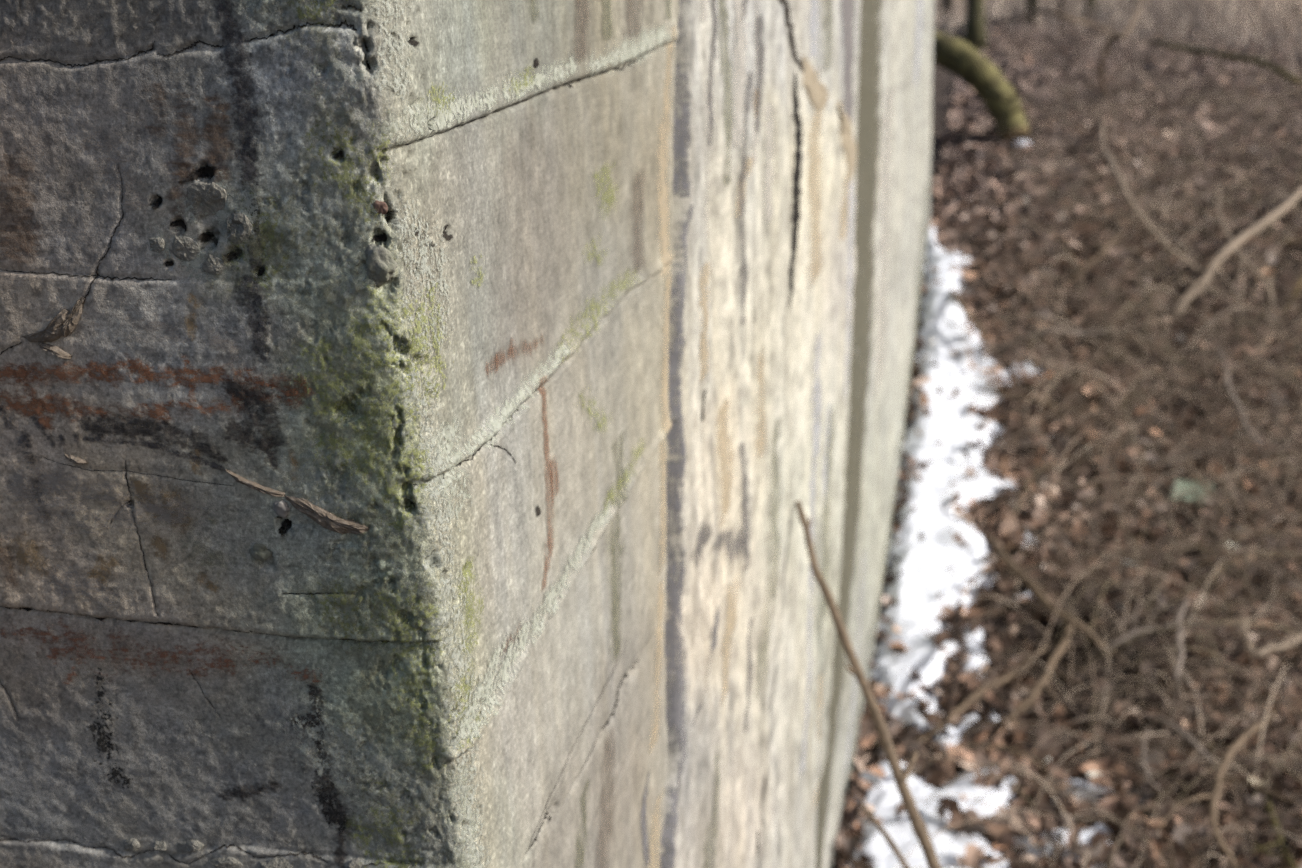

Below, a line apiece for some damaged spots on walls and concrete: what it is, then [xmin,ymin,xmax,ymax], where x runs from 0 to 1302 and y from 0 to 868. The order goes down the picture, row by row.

crack [0,4,362,67]
water stain [0,0,298,611]
corrosion [0,357,314,429]
corrosion [538,381,558,495]
crack [1,457,413,643]
water stain [217,782,280,801]
water stain [291,684,352,868]
crack [0,838,329,864]